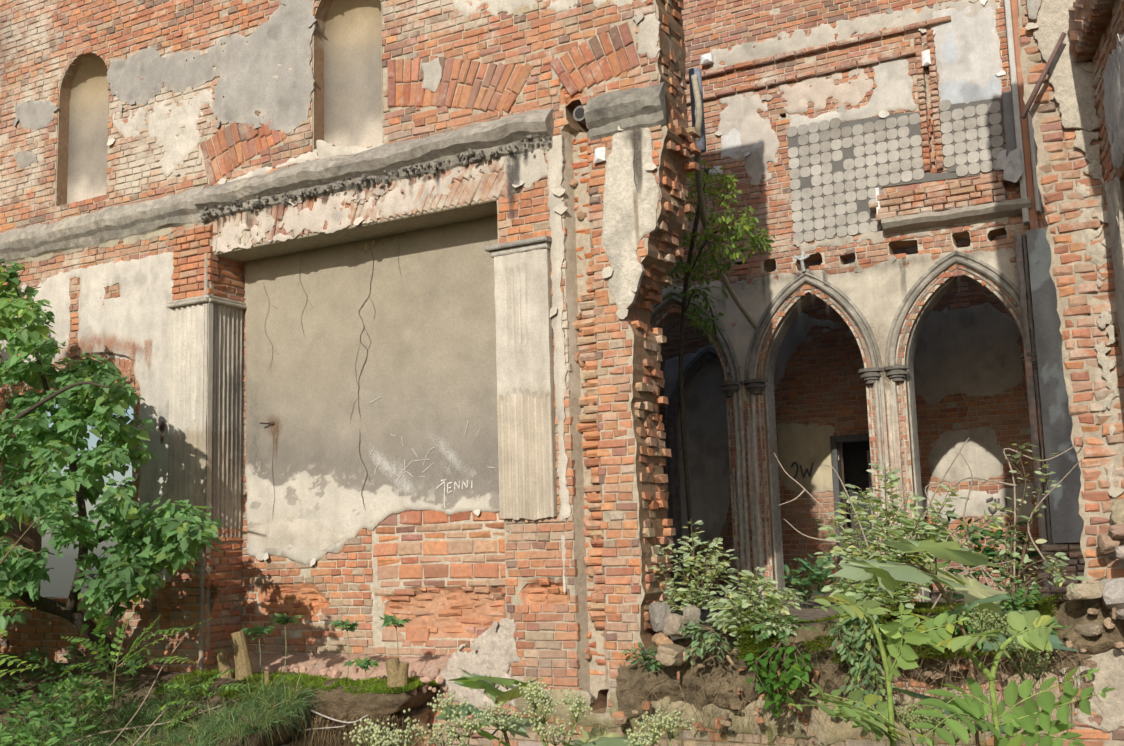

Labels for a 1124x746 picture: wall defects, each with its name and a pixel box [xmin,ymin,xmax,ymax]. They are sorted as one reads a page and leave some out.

flaking render [13,100,58,131]
flaking render [0,221,209,527]
flaking render [107,0,317,177]
crack [350,245,402,507]
flaking render [216,0,1036,630]
flaking render [1025,0,1124,436]
flaking render [1107,463,1124,497]
spalling [381,586,1124,746]